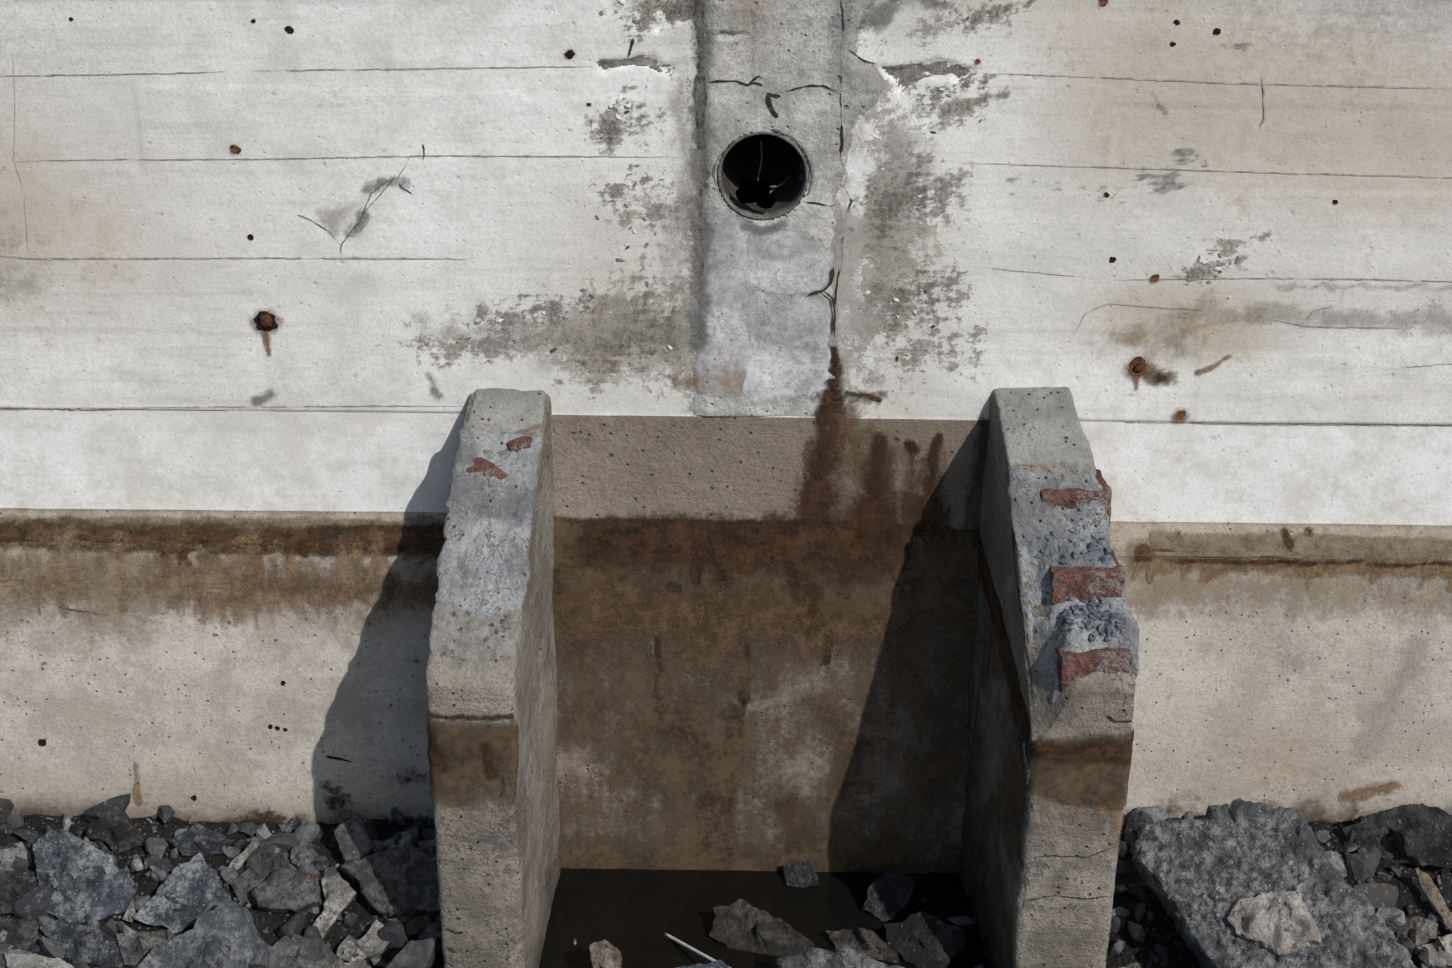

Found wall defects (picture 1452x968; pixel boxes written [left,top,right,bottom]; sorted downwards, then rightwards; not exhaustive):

peeling [849,61,1010,384]
rust [1126,359,1177,385]
leakage [0,518,445,640]
leakage [398,711,519,807]
leakage [552,418,1134,968]
spalling [1008,468,1140,707]